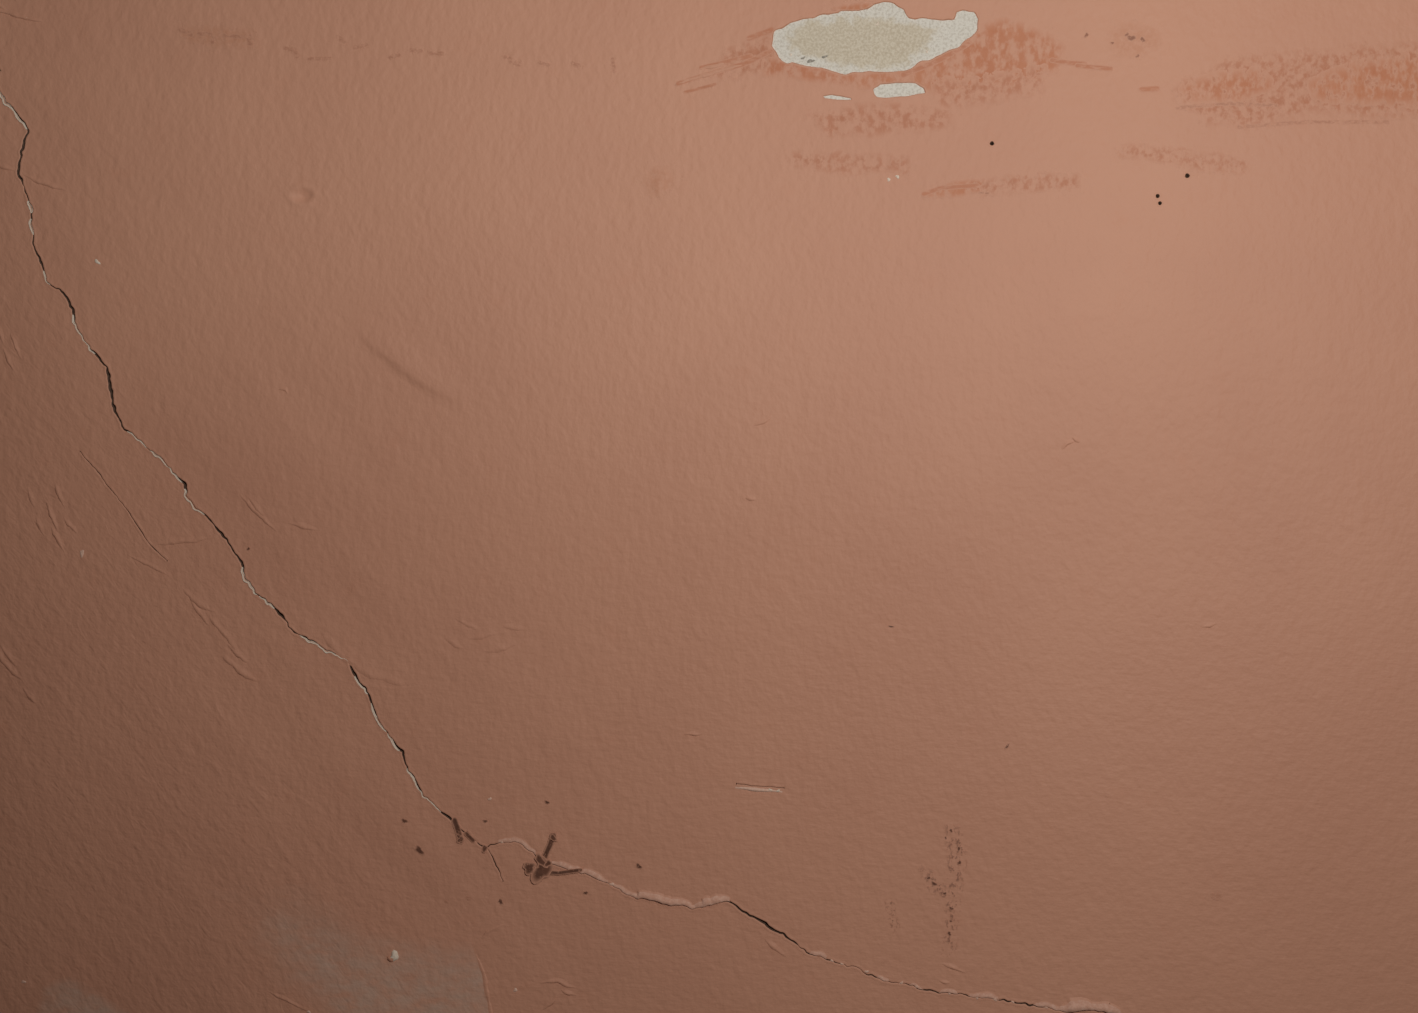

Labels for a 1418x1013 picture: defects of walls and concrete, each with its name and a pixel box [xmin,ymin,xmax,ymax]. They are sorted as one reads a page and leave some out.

peeling [769,0,981,102]
crack [0,65,1123,1013]